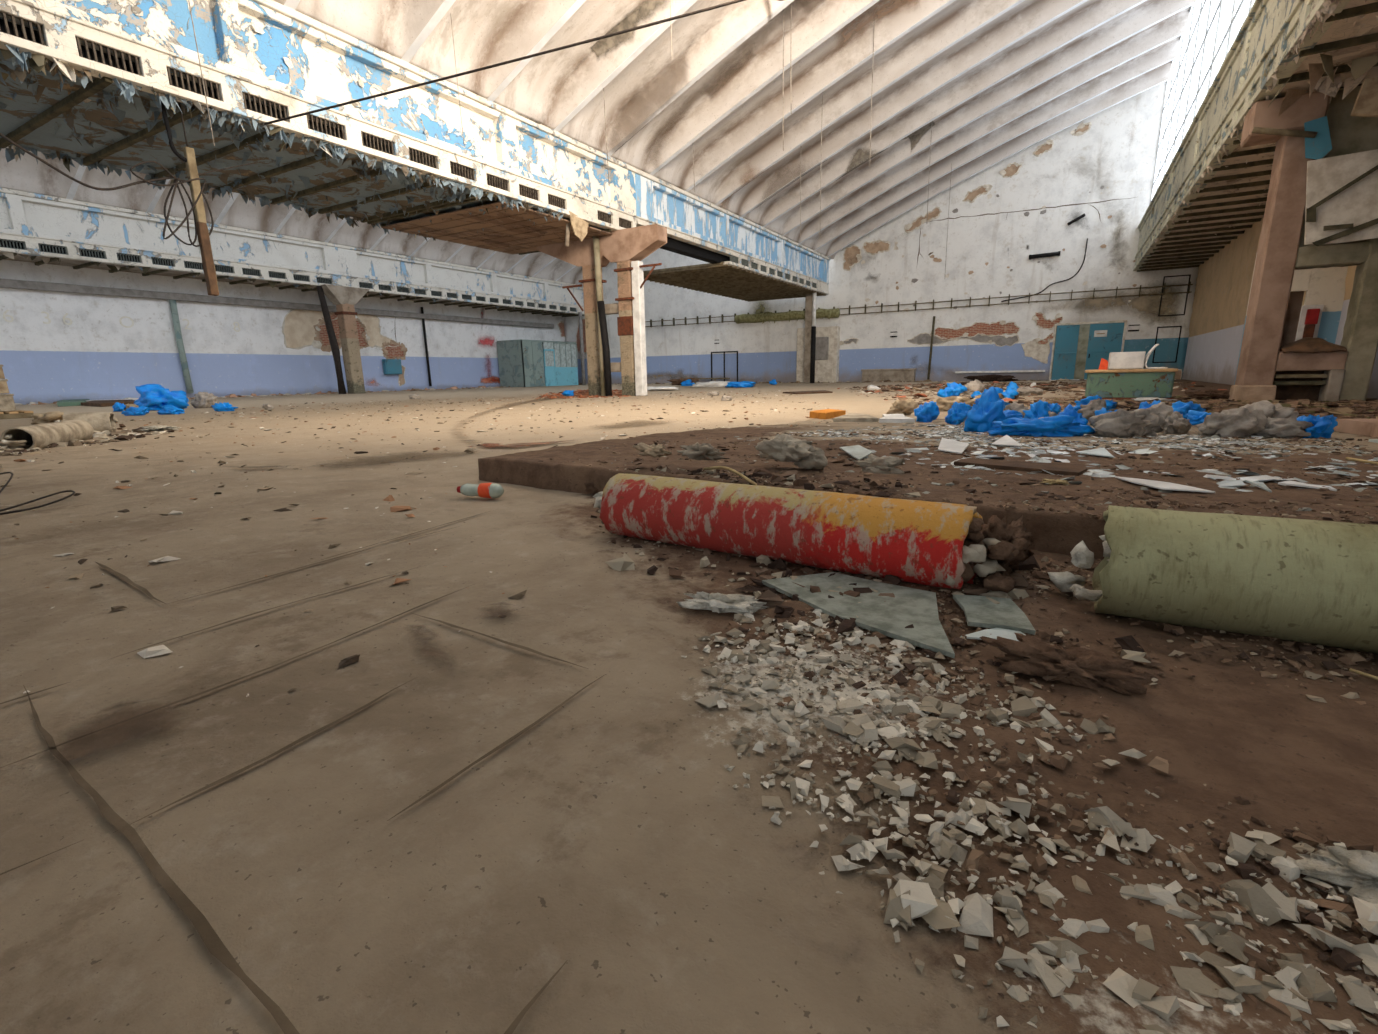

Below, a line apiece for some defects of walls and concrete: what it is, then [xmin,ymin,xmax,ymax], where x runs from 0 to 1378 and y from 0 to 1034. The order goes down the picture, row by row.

peeling [129,0,162,21]
peeling [251,23,293,86]
damp [591,0,666,57]
damp [613,0,823,153]
damp [840,0,914,43]
peeling [0,44,564,242]
damp [839,149,886,179]
damp [902,121,935,150]
peeling [1155,0,1378,243]
peeling [282,309,342,352]
peeling [356,314,407,386]
spalling [907,302,1063,364]